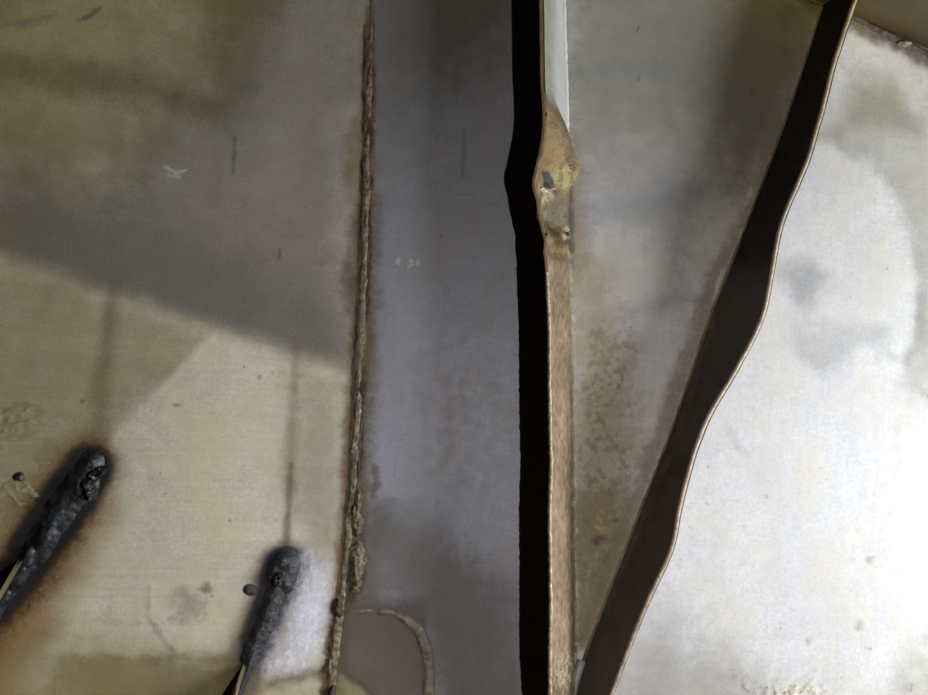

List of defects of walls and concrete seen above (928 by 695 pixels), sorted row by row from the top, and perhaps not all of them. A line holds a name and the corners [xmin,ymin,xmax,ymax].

corrosion [321,8,380,695]